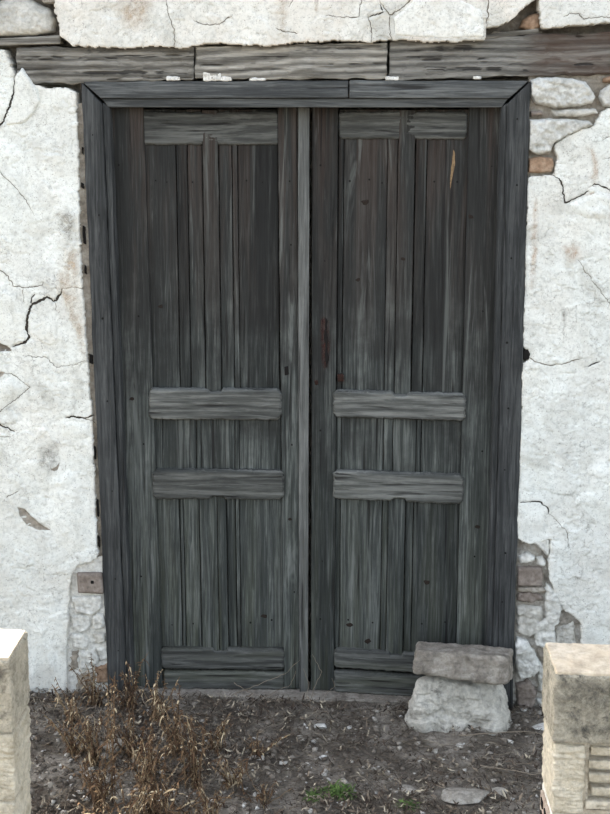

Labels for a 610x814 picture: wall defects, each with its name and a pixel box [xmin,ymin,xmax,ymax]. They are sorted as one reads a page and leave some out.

spalling [0,0,67,48]
crack [329,0,411,43]
crack [0,77,15,126]
spalling [528,74,610,177]
crack [551,174,610,204]
crack [0,270,83,368]
crack [0,373,30,437]
crack [66,415,96,424]
spalling [67,103,108,693]
spalling [17,507,50,530]
crack [520,501,569,547]
spalling [513,539,581,710]